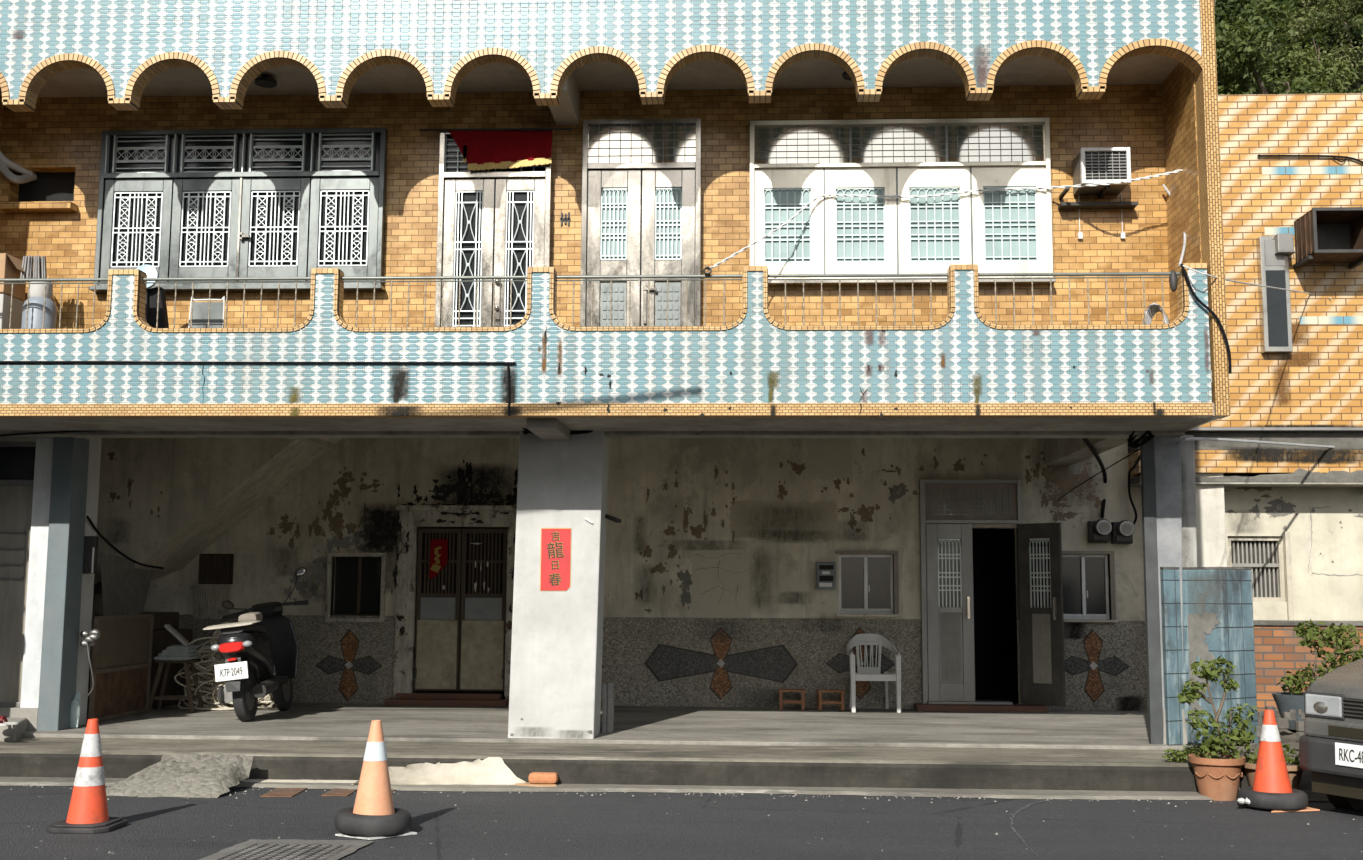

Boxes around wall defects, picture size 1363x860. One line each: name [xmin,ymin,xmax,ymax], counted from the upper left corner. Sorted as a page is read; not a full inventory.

corrosion [538,337,562,374]
water stain [362,505,399,553]
flaking render [266,459,518,602]
water stain [445,466,513,505]
peeling [634,461,737,614]
peeling [777,460,806,500]
peeling [820,464,919,536]
spalling [1195,468,1363,531]